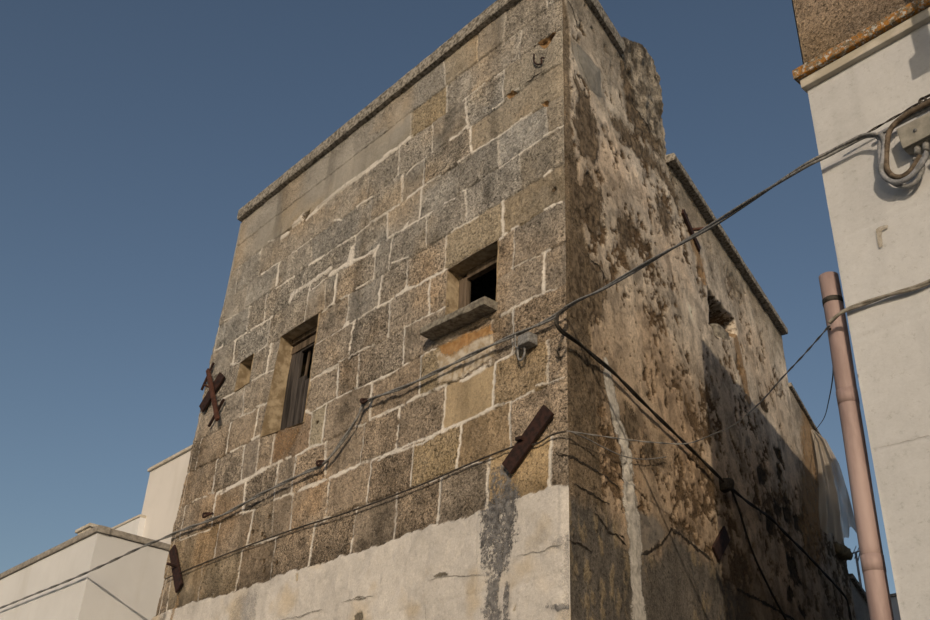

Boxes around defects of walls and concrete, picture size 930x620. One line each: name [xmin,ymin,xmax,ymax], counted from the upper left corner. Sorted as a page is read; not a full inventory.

flaking render [607,55,680,236]
flaking render [566,70,607,421]
flaking render [616,211,634,252]
spalling [707,295,735,340]
damp [480,465,520,620]